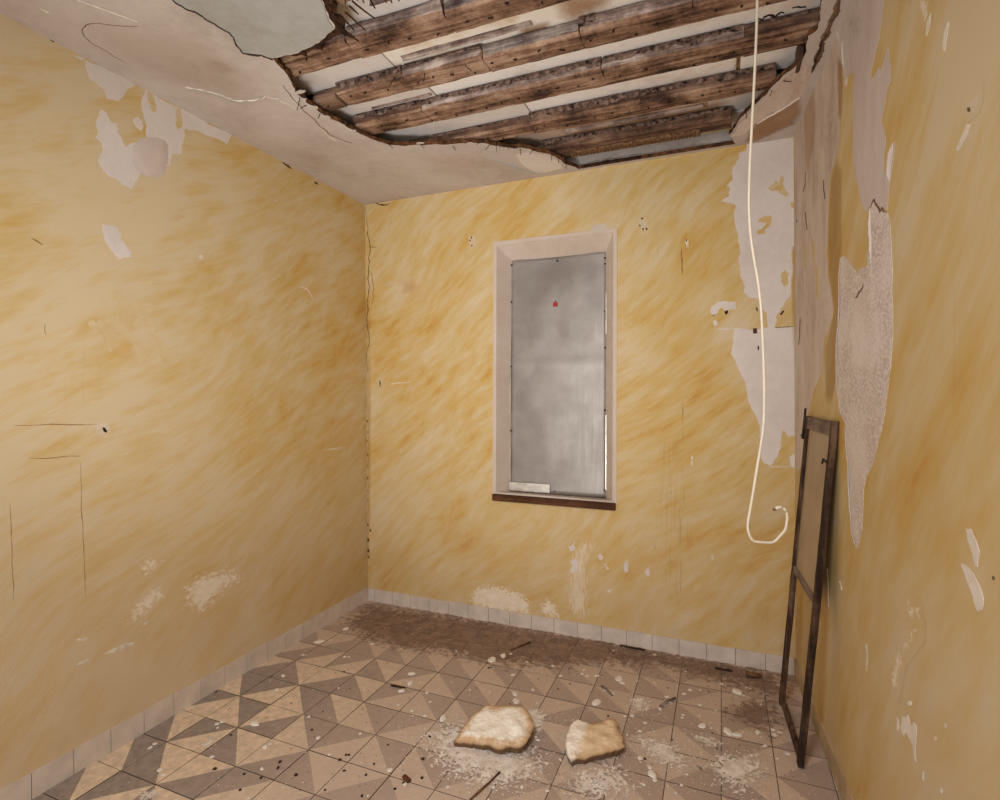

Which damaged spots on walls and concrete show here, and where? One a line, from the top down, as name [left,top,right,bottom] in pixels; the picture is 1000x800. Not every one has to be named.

peeling [75,56,231,189]
peeling [172,0,566,173]
flaking render [584,155,641,167]
peeling [102,224,131,259]
peeling [711,0,896,549]
peeling [465,528,611,625]
peeling [961,528,984,612]